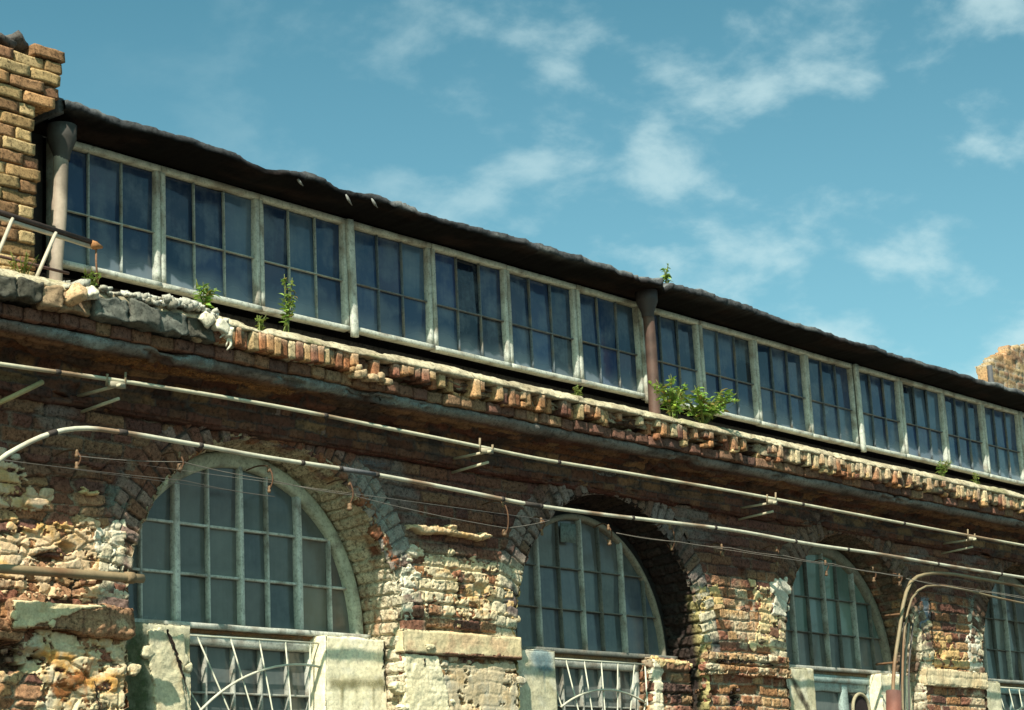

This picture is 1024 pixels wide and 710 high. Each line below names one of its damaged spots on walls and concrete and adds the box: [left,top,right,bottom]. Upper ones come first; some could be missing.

peeling [317,452,521,629]
peeling [0,447,193,710]
crack [166,629,187,694]
peeling [646,655,742,710]
peeling [696,583,724,614]
peeling [739,577,791,652]
peeling [917,614,984,672]